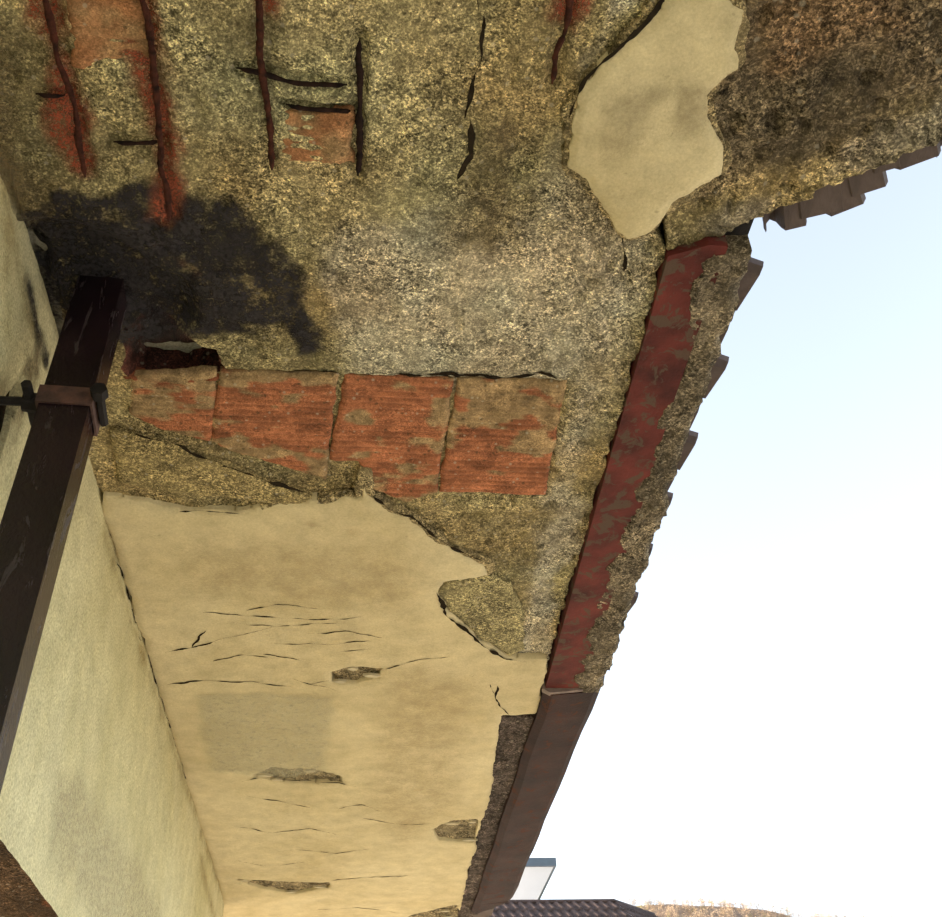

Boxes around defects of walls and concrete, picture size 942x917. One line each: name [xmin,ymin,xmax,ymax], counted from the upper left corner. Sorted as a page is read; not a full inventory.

rust [25,0,95,174]
rust [124,40,186,223]
leakage [0,65,322,370]
crack [457,0,486,180]
spalling [0,0,942,667]
crack [105,521,381,779]
crack [437,594,525,662]